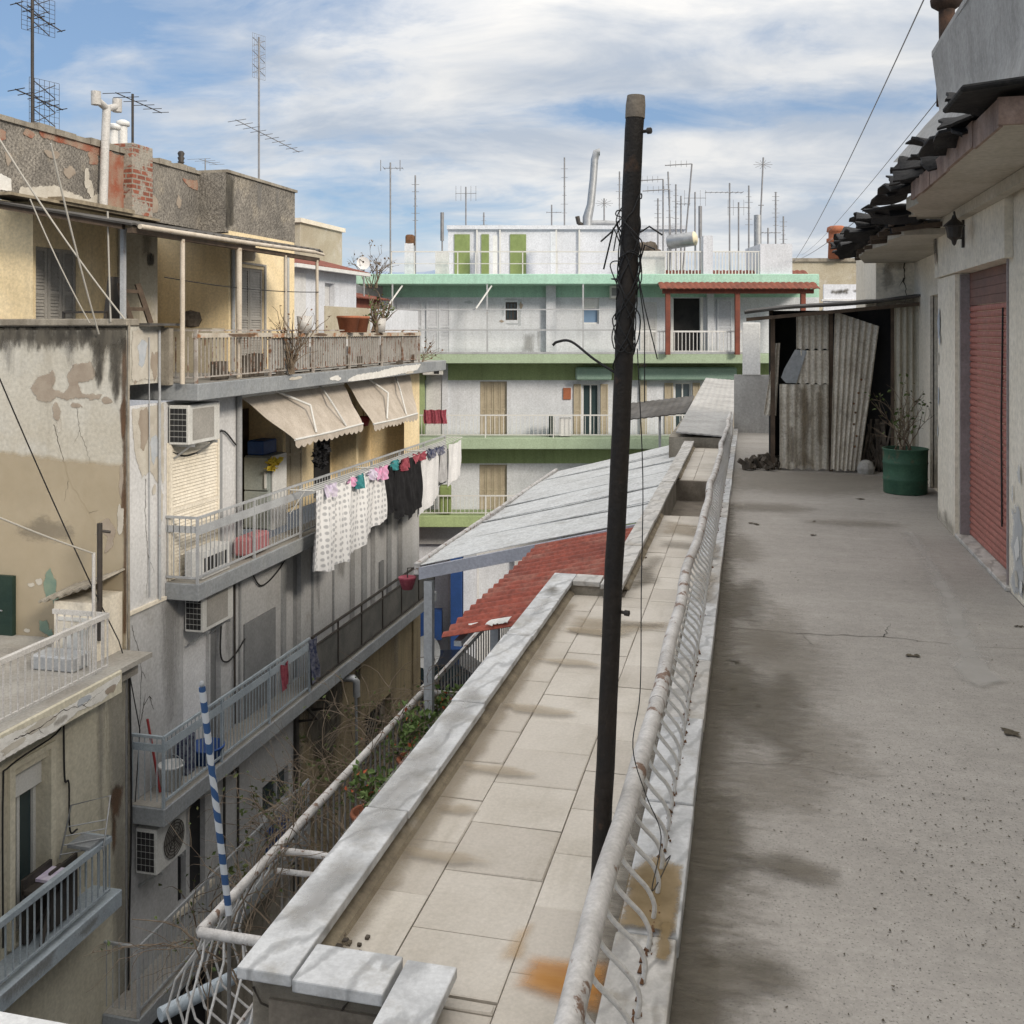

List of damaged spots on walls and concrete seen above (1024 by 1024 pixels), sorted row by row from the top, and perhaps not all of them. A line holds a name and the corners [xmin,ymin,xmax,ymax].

flaking render [0,129,124,208]
damp [0,326,126,400]
peeling [31,361,112,433]
corrosion [656,650,701,859]
damp [584,534,794,1024]
corrosion [525,961,569,995]
corrosion [589,966,603,1006]
corrosion [637,896,660,985]